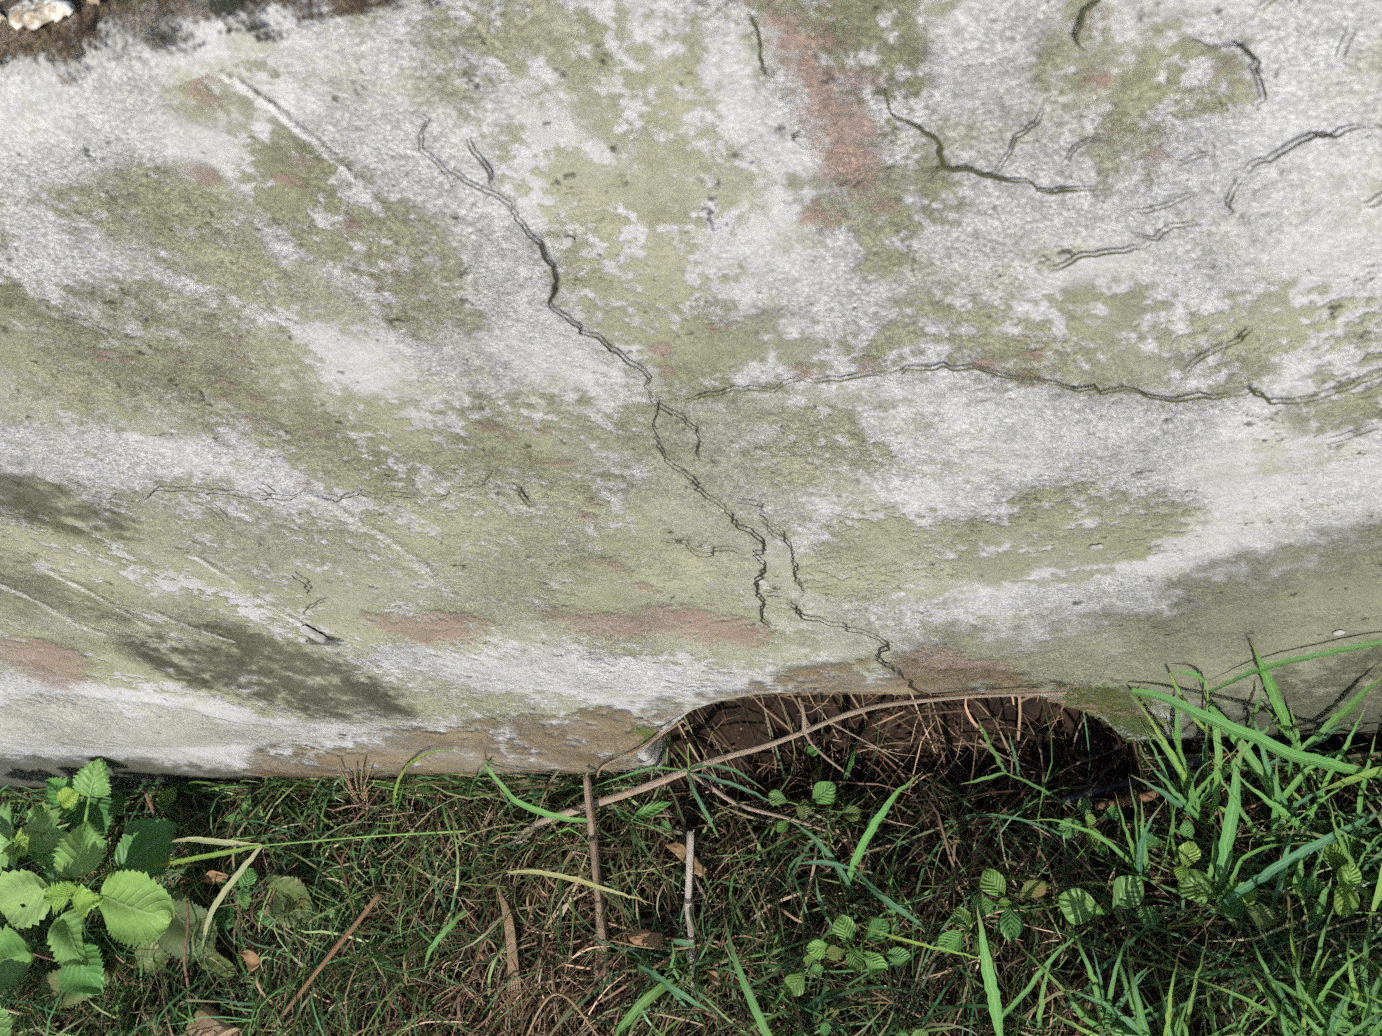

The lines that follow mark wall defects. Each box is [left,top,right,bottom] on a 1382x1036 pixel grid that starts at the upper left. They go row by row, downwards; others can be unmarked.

crack [747,12,775,79]
crack [1075,0,1101,53]
crack [1185,40,1267,113]
crack [872,90,1104,194]
crack [412,113,1382,697]
water stain [0,475,127,540]
water stain [0,562,127,622]
water stain [914,525,1382,741]